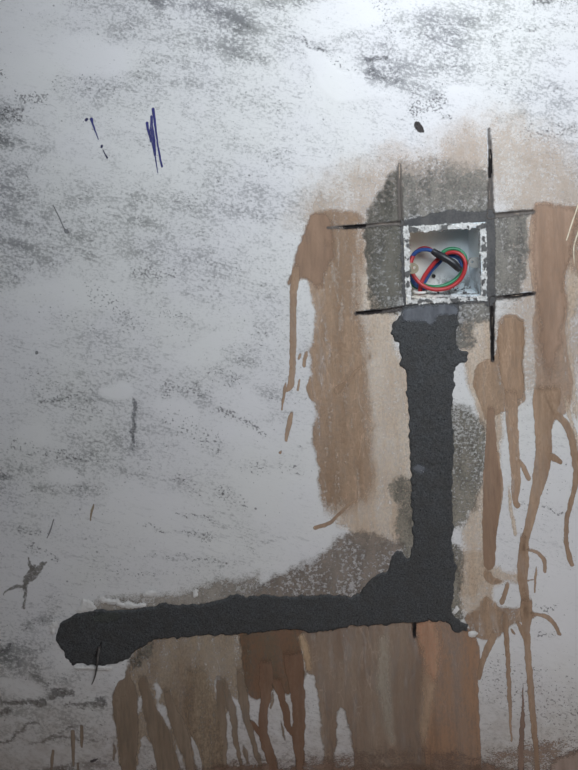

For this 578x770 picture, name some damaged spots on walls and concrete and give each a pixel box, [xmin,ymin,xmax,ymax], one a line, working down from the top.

water stain [112,634,249,770]
water stain [281,126,578,770]